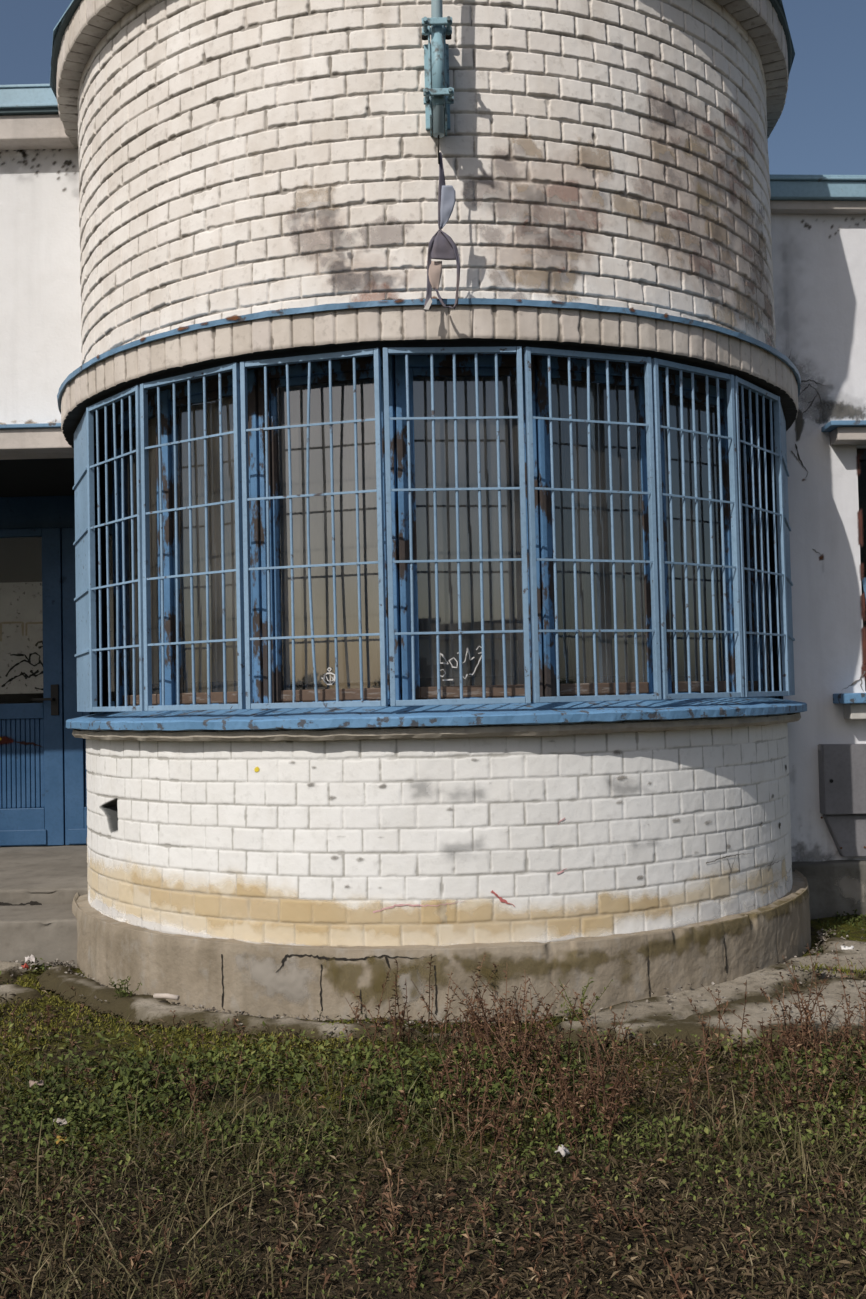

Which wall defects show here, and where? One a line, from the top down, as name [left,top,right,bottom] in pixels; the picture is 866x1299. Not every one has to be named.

leakage [816,401,866,423]
crack [0,899,42,907]
leakage [87,844,830,1003]
crack [275,954,437,1014]